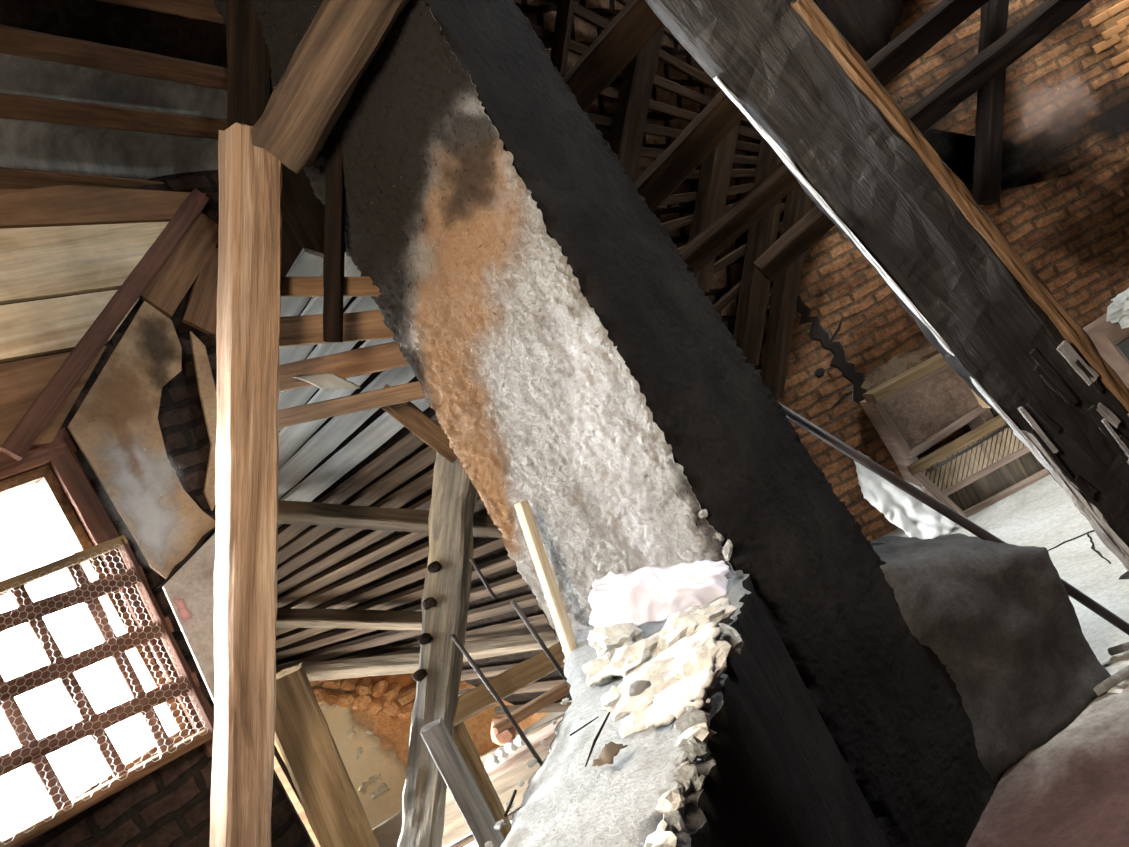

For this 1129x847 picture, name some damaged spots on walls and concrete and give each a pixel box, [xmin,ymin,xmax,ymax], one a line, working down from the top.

water stain [448,117,495,213]
crack [797,295,867,406]
peeling [587,621,722,688]
spalling [643,663,727,847]